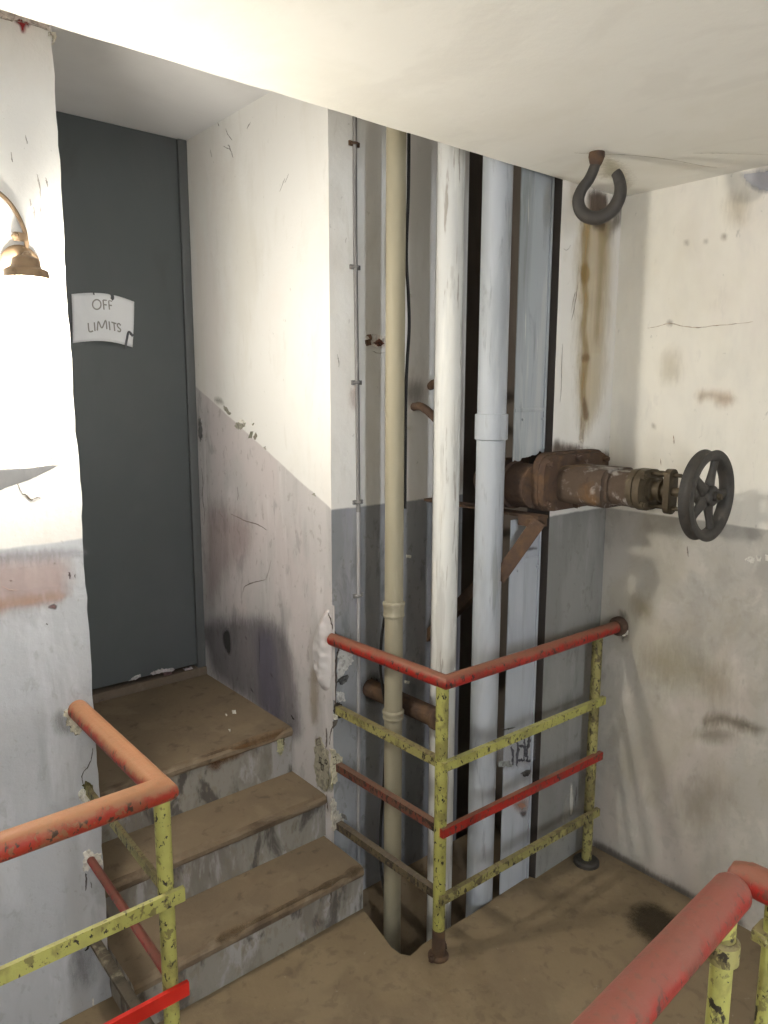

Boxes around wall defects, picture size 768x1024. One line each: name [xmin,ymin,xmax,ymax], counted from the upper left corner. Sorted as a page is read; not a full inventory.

rust [581,223,589,400]
crack [650,320,753,328]
peeling [223,406,266,450]
peeling [0,465,56,490]
flaking render [313,736,347,831]